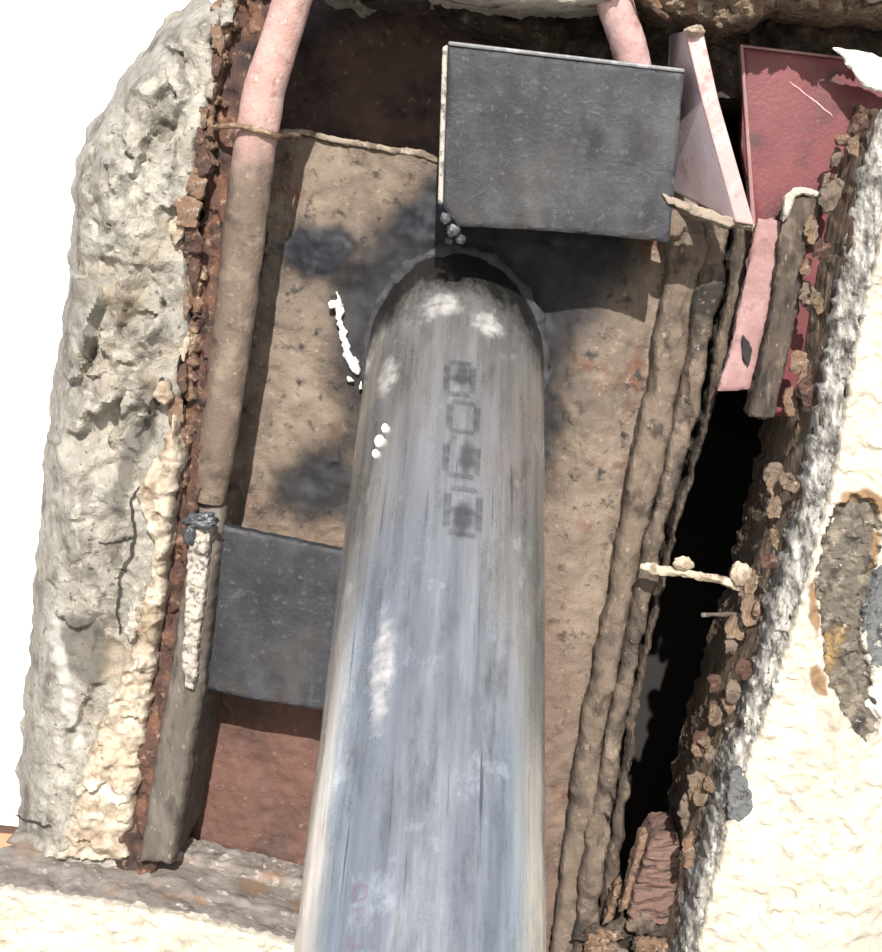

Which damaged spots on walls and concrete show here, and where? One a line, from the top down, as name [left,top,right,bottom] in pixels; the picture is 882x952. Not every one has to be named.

spalling [723,115,747,199]
peeling [798,108,869,323]
crack [135,377,164,438]
corrosion [168,254,210,516]
peeling [782,350,813,417]
crack [99,486,140,635]
spalling [619,389,800,882]
spalling [814,495,882,742]
peeling [175,837,304,893]